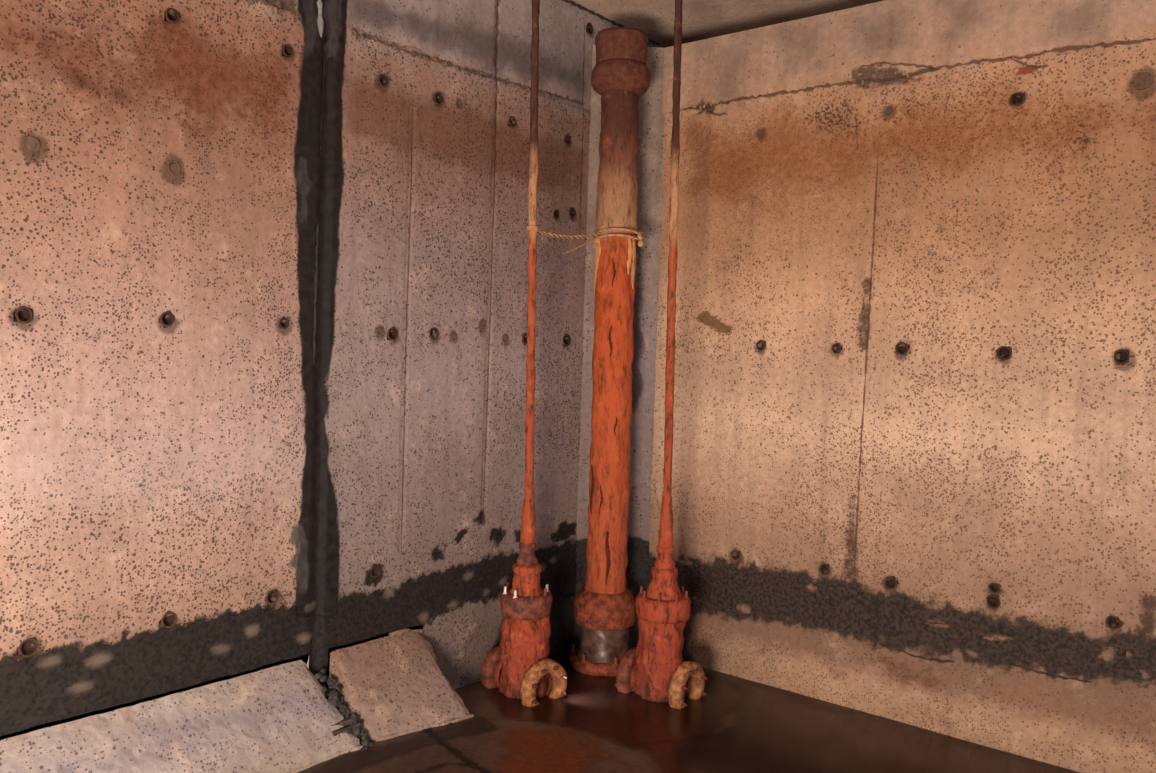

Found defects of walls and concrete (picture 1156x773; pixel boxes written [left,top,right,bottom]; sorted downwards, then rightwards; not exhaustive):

crack [668,38,1156,116]
crack [844,148,879,578]
crack [1137,594,1156,634]